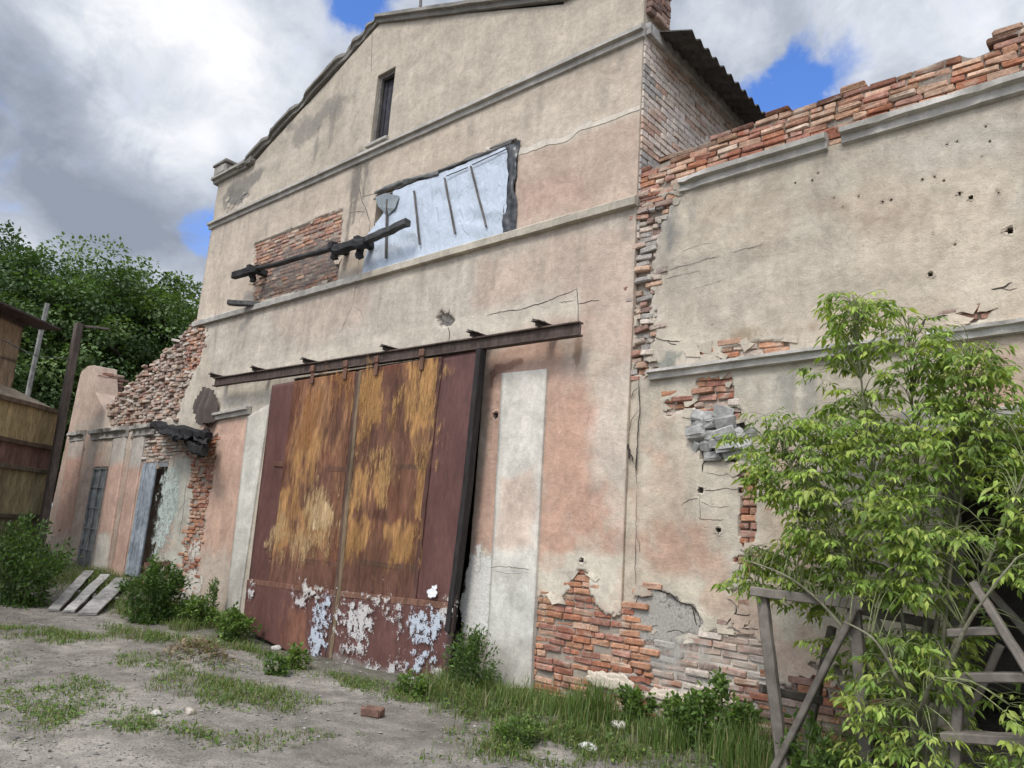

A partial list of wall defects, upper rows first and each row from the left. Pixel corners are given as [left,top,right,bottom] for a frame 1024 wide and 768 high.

spalling [249,210,343,301]
crack [489,289,599,321]
spalling [624,183,683,382]
crack [666,243,761,288]
spalling [661,334,798,422]
spalling [106,319,220,603]
rust [264,476,340,561]
rust [351,362,446,509]
crack [625,379,700,687]
crack [684,458,735,520]
peeling [291,577,458,680]
spalling [533,461,774,745]